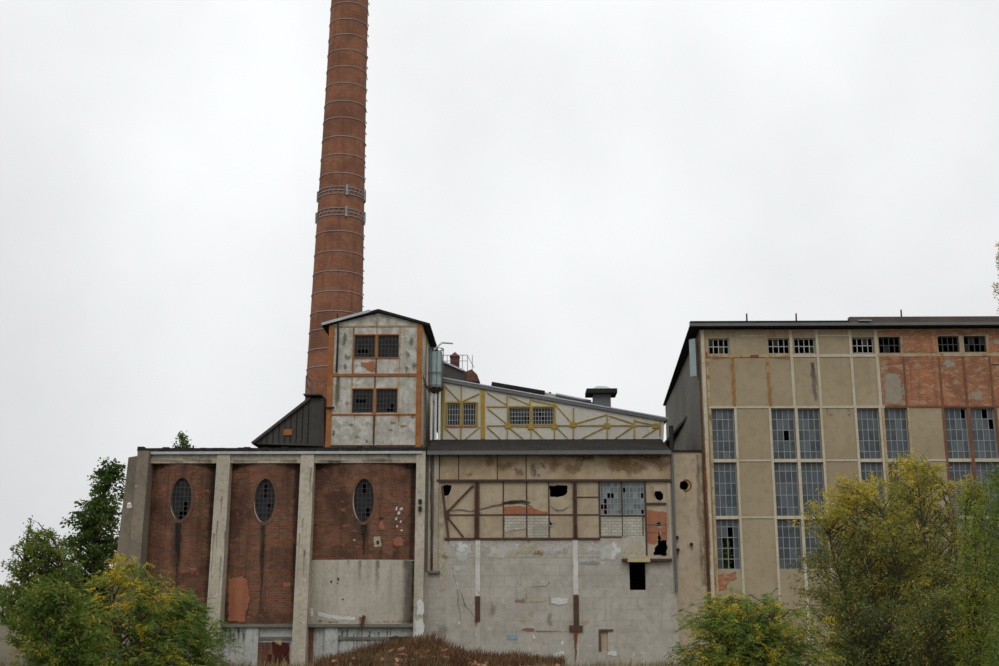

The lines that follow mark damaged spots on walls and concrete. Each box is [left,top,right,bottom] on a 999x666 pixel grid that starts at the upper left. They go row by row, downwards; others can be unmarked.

peeling [878,329,999,406]
peeling [430,496,569,592]
peeling [584,510,667,561]